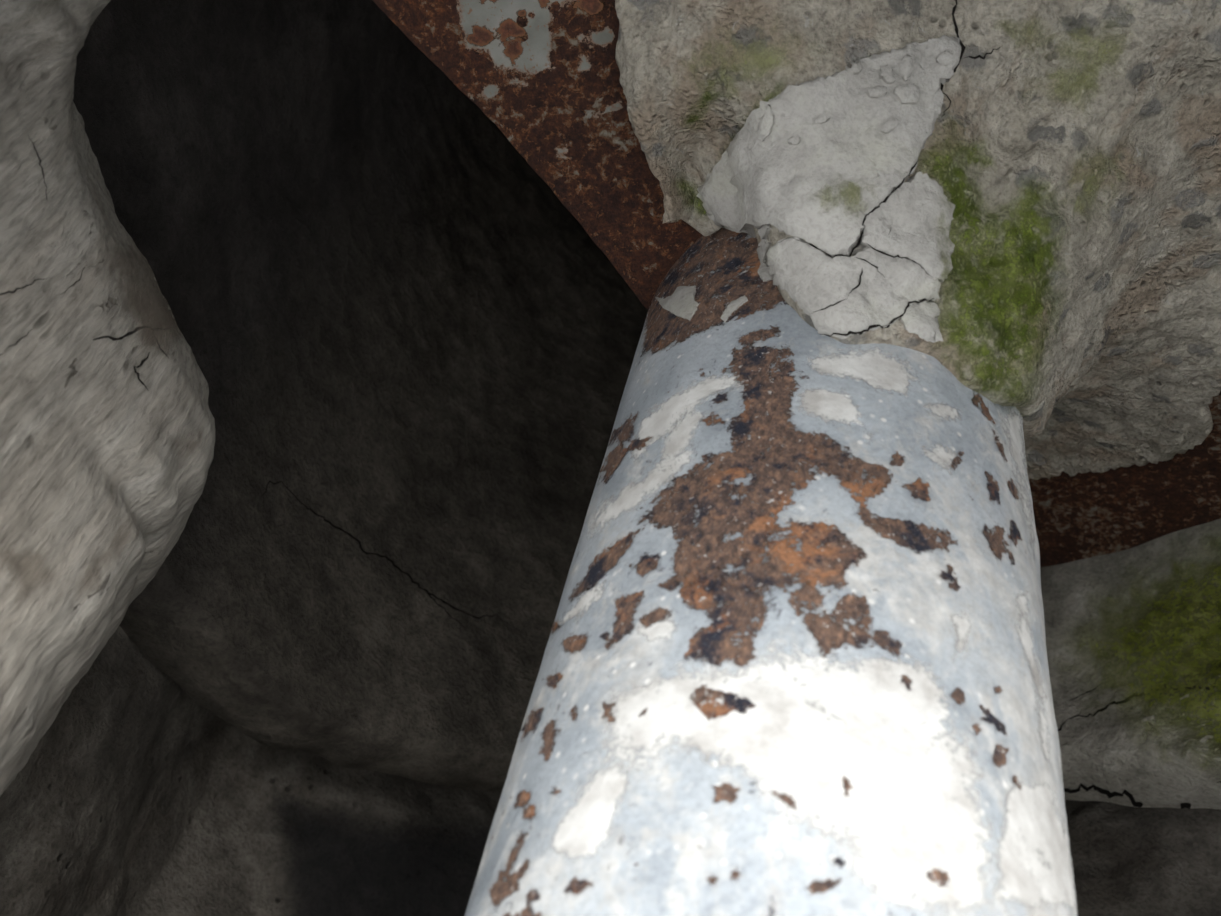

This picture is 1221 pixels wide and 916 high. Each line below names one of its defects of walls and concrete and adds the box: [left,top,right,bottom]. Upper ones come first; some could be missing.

spalling [697,35,961,343]
crack [781,162,934,337]
peeling [655,285,699,321]
rust [640,228,789,357]
rust [550,324,961,667]
rust [689,684,756,720]
rust [973,705,1022,789]
crack [1057,683,1216,731]
crack [1064,783,1143,807]
crack [1180,802,1191,810]
rust [489,790,542,916]
rust [805,856,847,894]